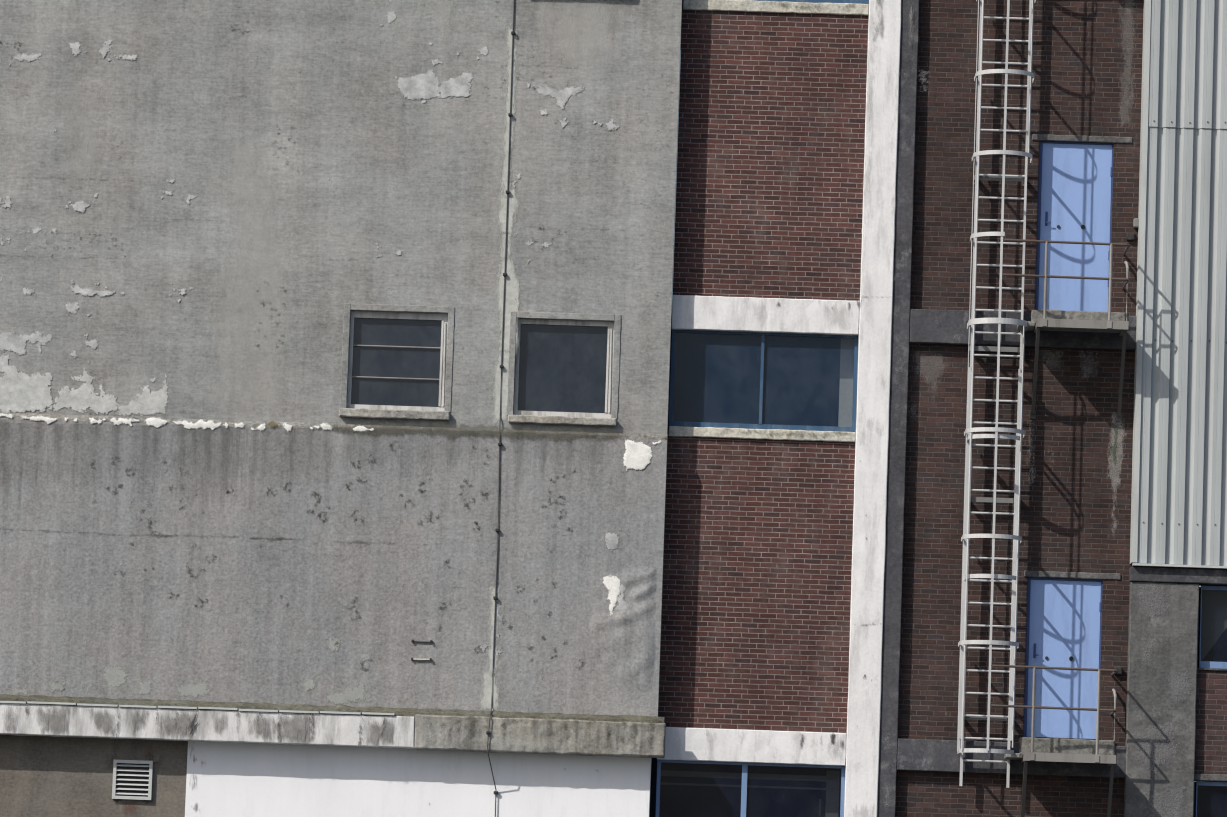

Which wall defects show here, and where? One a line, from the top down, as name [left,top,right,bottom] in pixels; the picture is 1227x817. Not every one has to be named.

peeling [395,42,488,104]
peeling [526,82,584,129]
peeling [0,280,292,431]
spalling [623,439,662,471]
peeling [605,533,619,551]
peeling [603,574,629,616]
damp [4,708,68,735]
damp [91,708,193,737]
damp [249,713,313,743]
damp [358,718,393,746]